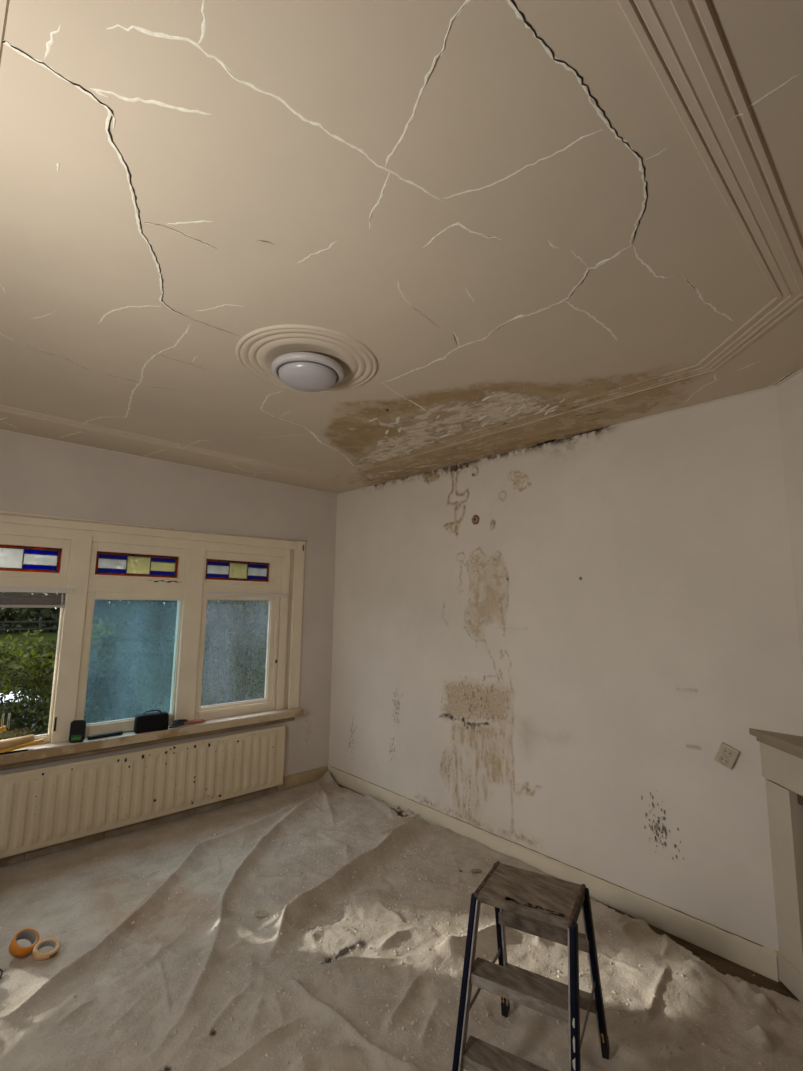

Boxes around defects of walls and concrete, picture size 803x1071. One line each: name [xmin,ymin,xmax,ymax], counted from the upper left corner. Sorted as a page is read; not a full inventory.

crack [730,74,800,121]
crack [2,25,245,438]
crack [106,0,733,415]
peeling [358,391,565,479]
damp [332,374,688,535]
damp [642,792,684,859]